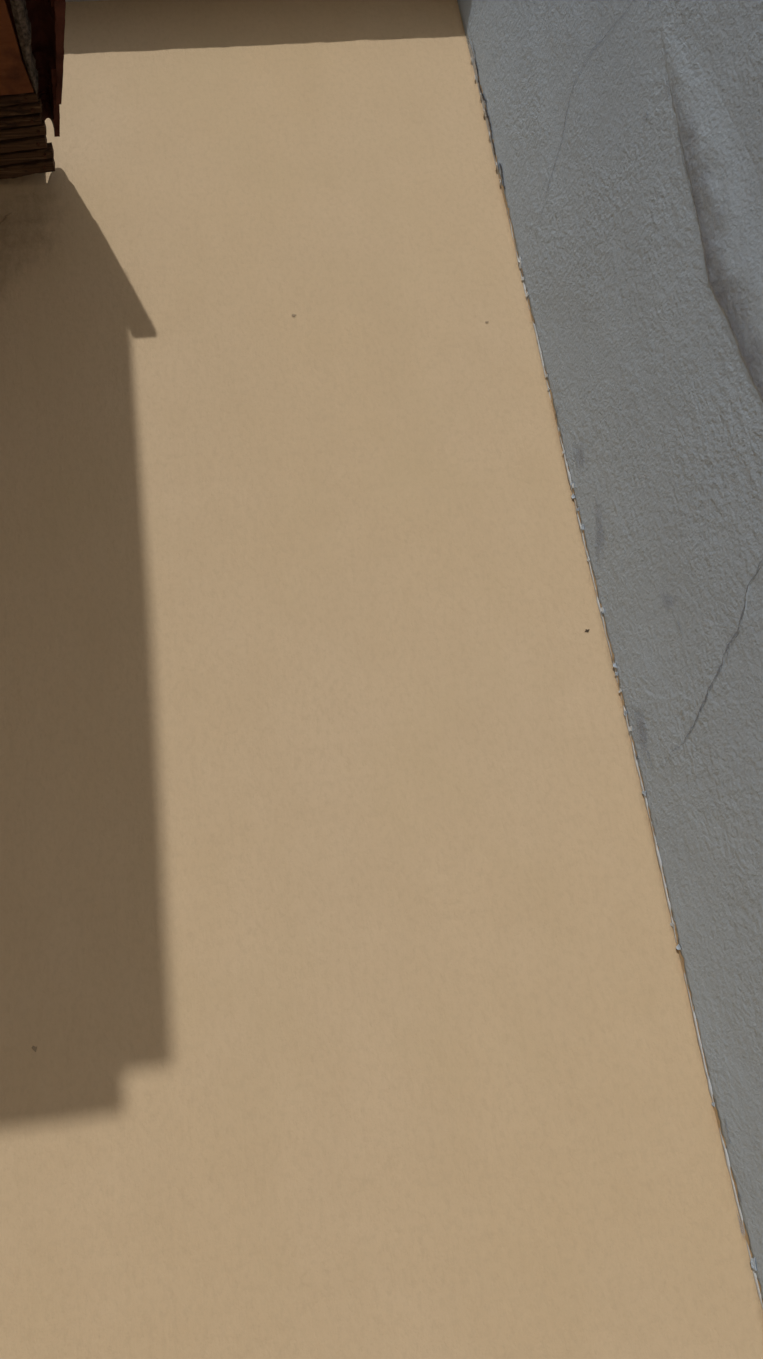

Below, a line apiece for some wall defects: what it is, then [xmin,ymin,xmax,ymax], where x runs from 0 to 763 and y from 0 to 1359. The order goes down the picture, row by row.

crack [685,563,763,738]